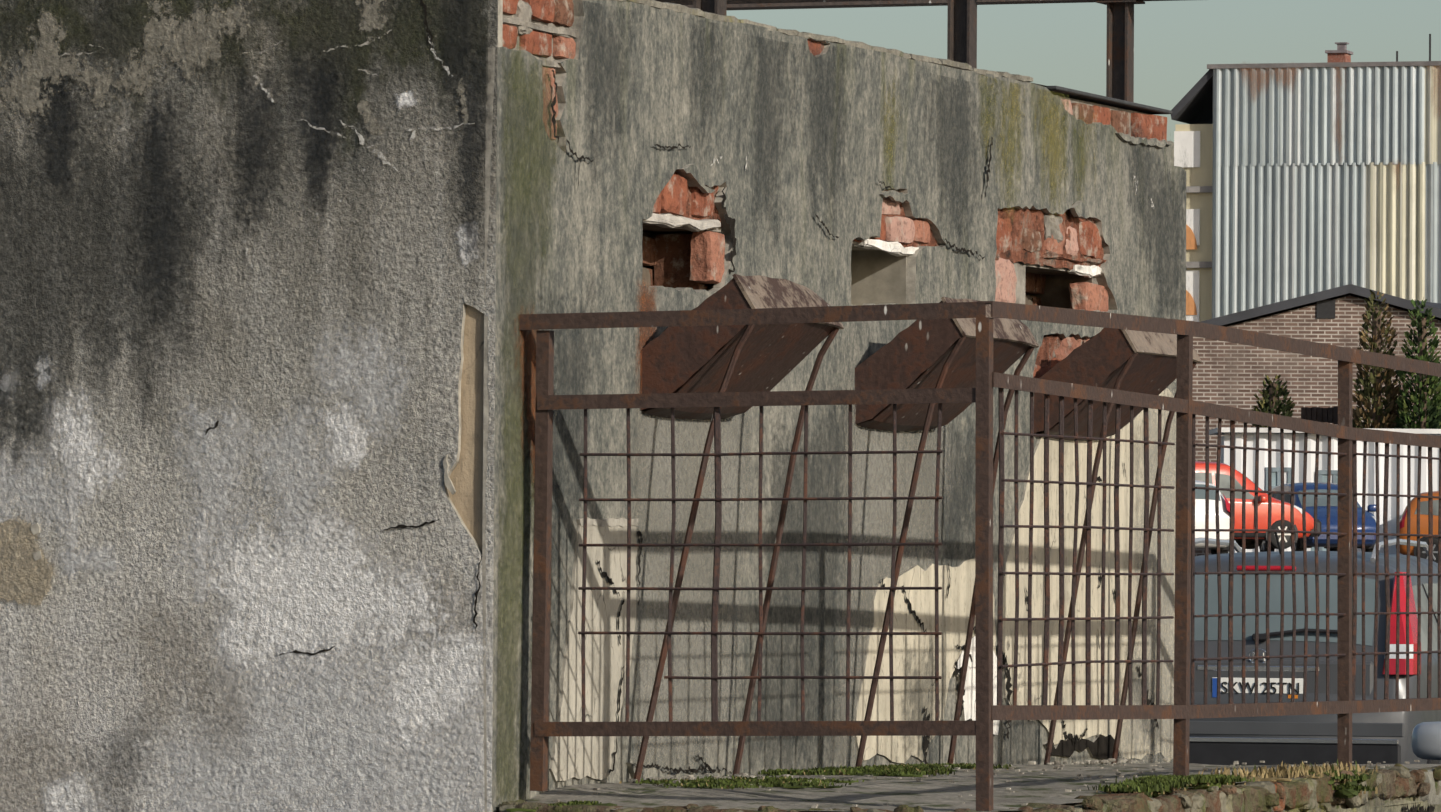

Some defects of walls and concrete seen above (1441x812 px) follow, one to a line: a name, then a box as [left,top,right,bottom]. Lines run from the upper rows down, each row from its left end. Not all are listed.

spalling [502,0,578,141]
spalling [1061,99,1173,148]
spalling [642,157,737,284]
spalling [853,190,939,257]
spalling [995,201,1109,312]
damp [0,0,556,812]
spalling [443,304,484,551]
peeling [0,518,54,607]
crack [384,519,439,530]
peeling [549,412,751,781]
peeling [841,408,976,763]
peeling [993,388,1176,764]